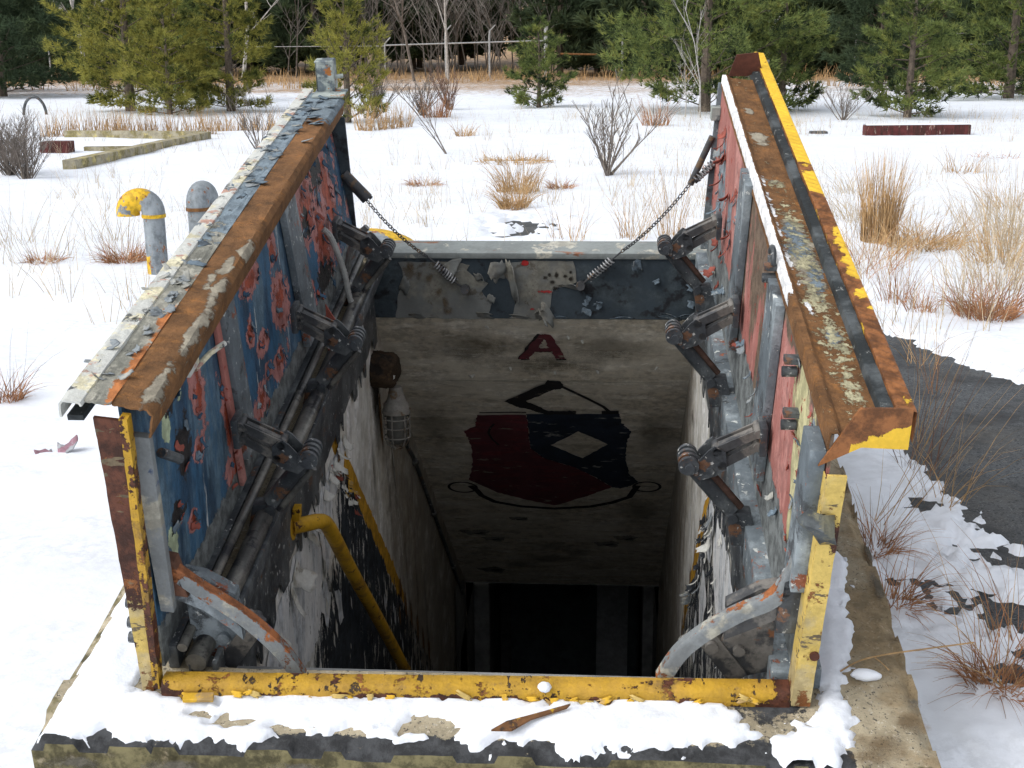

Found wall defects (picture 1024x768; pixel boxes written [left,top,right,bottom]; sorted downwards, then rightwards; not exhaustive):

peeling [227,95,338,199]
peeling [301,134,347,300]
peeling [703,127,738,295]
peeling [84,219,219,380]
peeling [396,258,603,329]
peeling [732,339,745,355]
peeling [308,434,361,519]
peeling [756,464,798,517]
peeling [274,529,352,666]